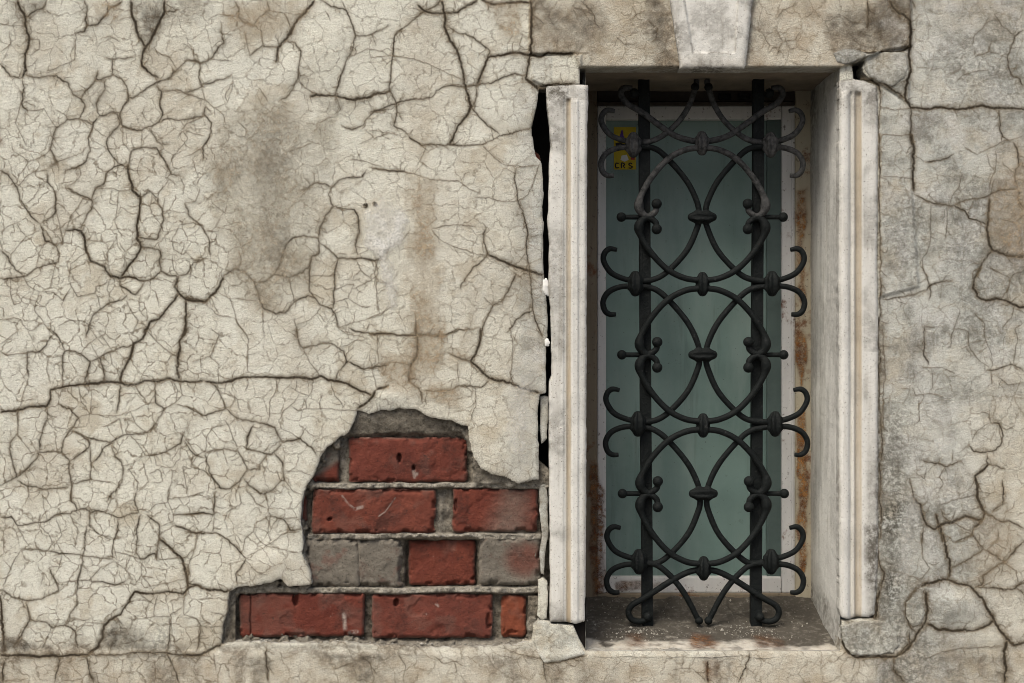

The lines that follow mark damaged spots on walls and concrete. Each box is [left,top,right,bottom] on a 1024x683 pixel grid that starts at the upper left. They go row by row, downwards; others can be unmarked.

crack [0,0,584,682]
corrosion [795,330,807,386]
crack [841,0,1024,682]
flaking render [222,408,585,663]
corrosion [797,412,809,572]